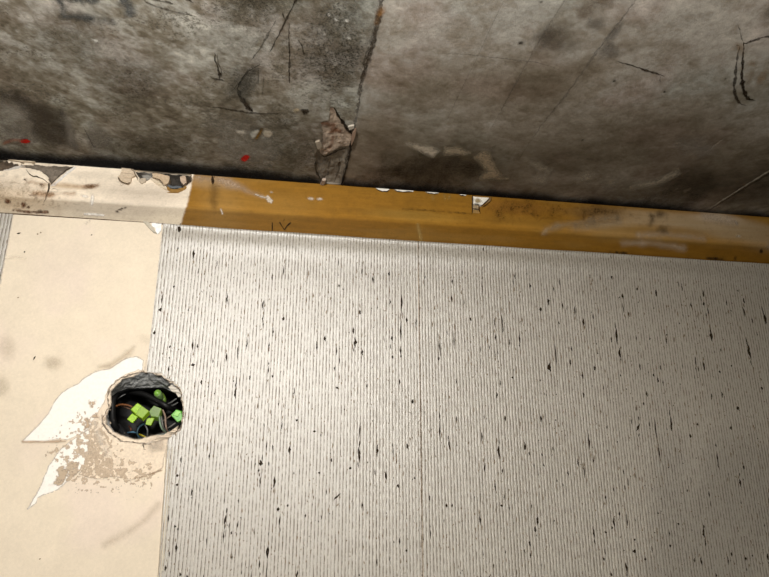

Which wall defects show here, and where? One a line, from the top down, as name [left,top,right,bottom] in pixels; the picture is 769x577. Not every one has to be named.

crack [144,0,193,16]
crack [208,0,304,114]
crack [341,0,383,183]
crack [733,36,769,106]
flaking render [0,159,76,201]
flaking render [118,168,192,193]
damp [0,149,319,184]
spalling [315,107,356,185]
damp [407,143,466,156]
damp [476,152,503,179]
damp [341,181,769,224]
flaking render [22,357,168,508]